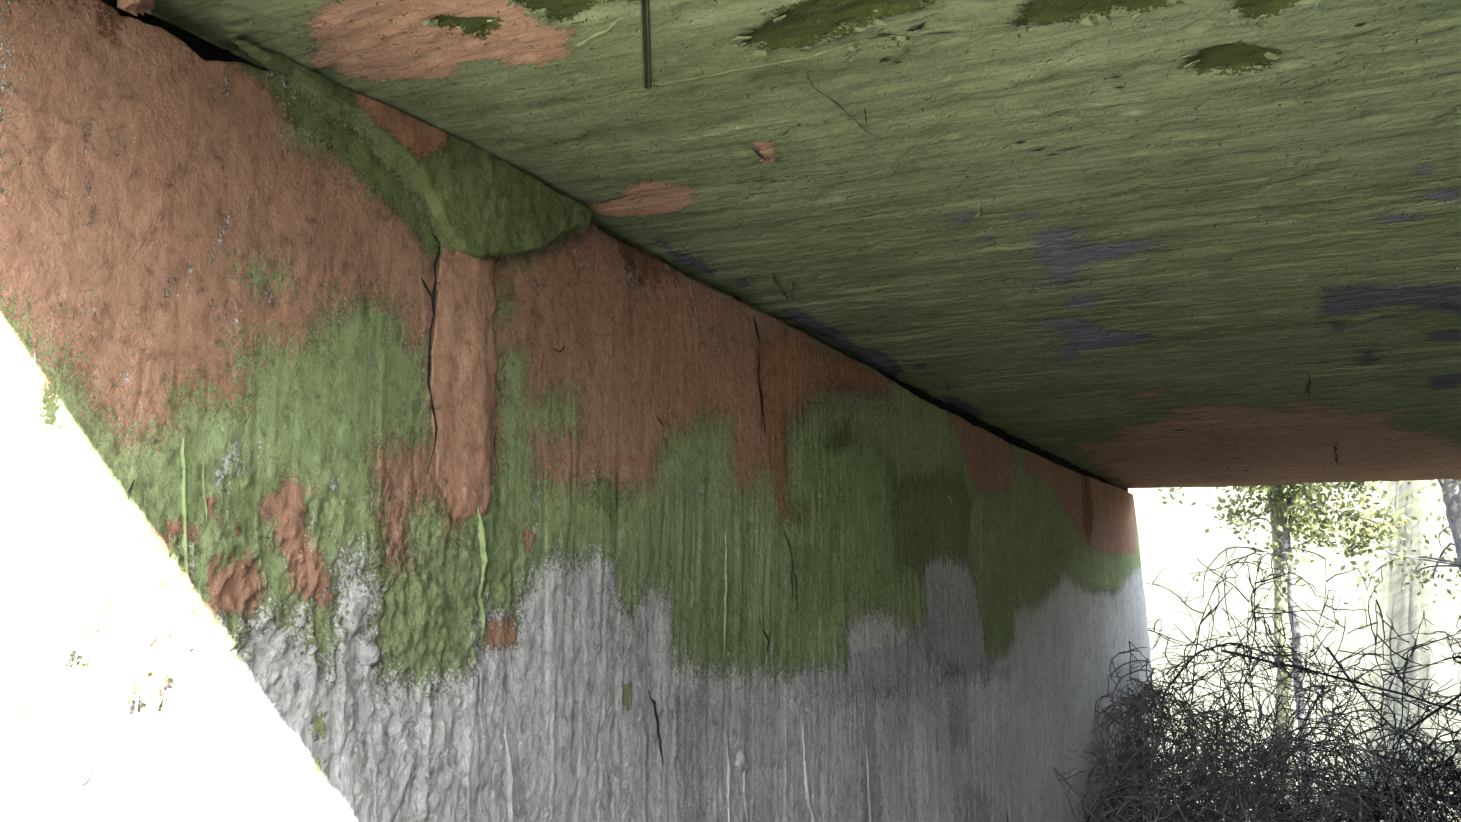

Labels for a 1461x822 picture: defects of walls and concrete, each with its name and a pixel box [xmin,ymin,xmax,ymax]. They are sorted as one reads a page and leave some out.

spalling [414,0,633,40]
spalling [732,0,946,64]
spalling [1005,0,1187,27]
spalling [1227,0,1301,26]
spalling [1178,41,1282,76]
crack [421,229,441,474]